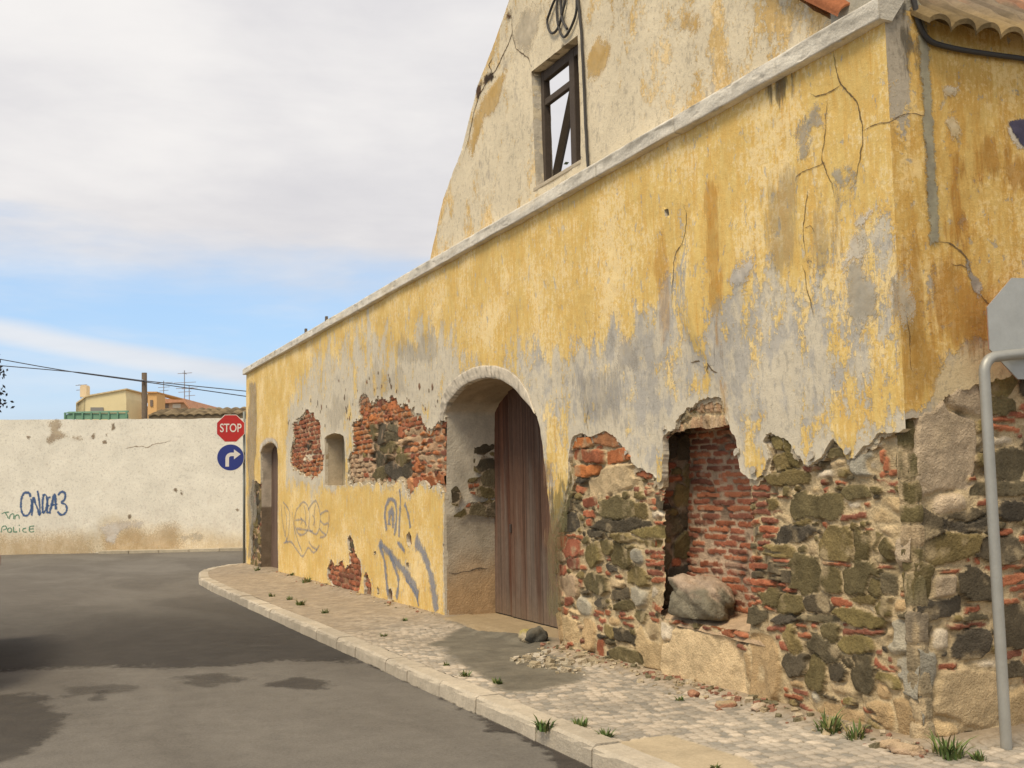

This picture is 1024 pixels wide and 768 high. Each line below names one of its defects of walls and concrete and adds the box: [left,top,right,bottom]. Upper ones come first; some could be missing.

crack [462,10,530,160]
crack [795,53,923,312]
crack [944,242,989,305]
spalling [288,399,329,479]
spalling [338,372,495,518]
spalling [251,481,262,567]
spalling [328,537,371,594]
spalling [555,375,1024,737]